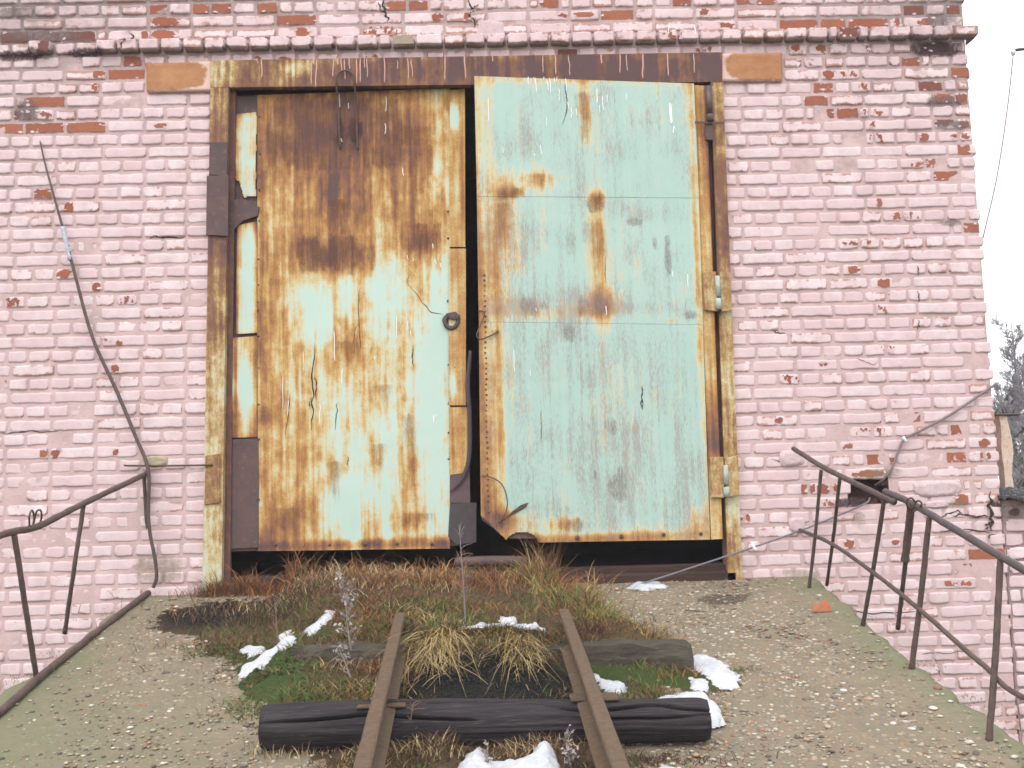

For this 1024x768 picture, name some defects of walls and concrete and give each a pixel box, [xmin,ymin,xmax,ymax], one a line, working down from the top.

peeling [140,5,179,39]
crack [378,0,390,21]
peeling [0,31,95,50]
spalling [90,56,145,91]
spalling [0,97,107,134]
spalling [805,70,884,142]
spalling [918,81,968,103]
spalling [918,119,972,154]
spalling [906,158,958,181]
spalling [801,454,895,506]
crack [942,492,994,533]
spalling [944,548,1006,586]